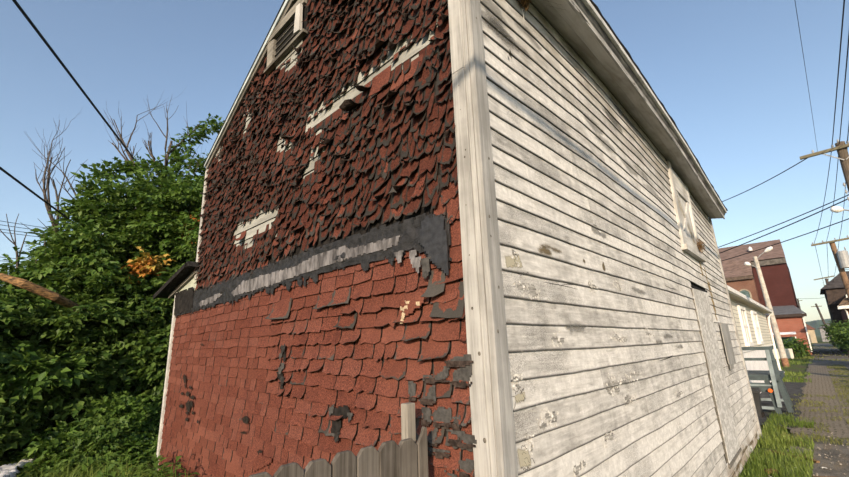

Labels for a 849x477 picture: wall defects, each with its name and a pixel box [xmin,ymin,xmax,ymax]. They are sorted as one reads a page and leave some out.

peeling [272,14,439,187]
peeling [233,199,279,251]
peeling [513,281,540,300]
peeling [606,371,640,406]
peeling [525,407,559,455]
peeling [573,460,587,477]